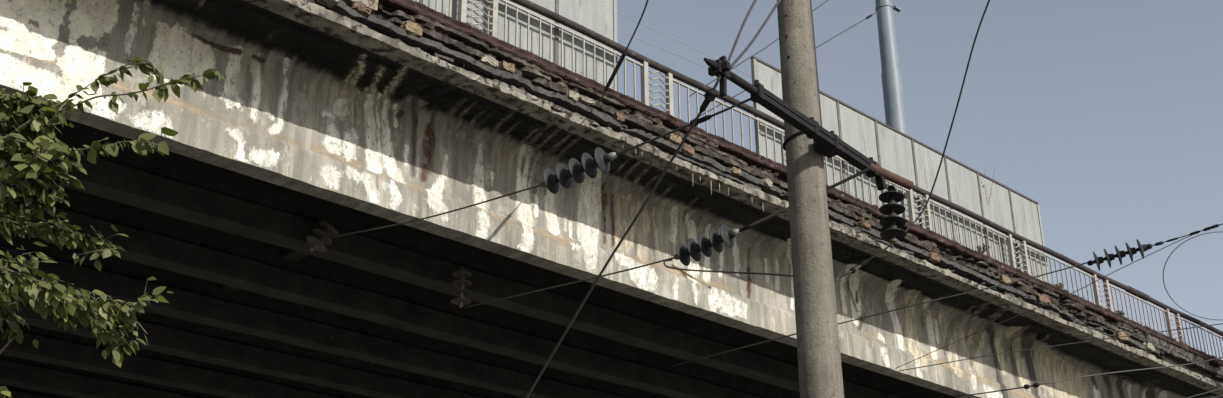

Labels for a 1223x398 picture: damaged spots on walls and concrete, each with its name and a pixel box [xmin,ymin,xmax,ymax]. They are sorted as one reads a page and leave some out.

water stain [24,0,77,66]
efflorescence [224,45,291,134]
water stain [314,55,480,200]
spalling [399,21,423,38]
corrosion [422,124,432,181]
spalling [477,55,515,73]
spalling [564,90,595,106]
water stain [473,116,740,287]
water stain [764,238,794,310]
peeling [877,332,890,368]
water stain [840,264,1050,398]
peeling [970,373,1003,398]